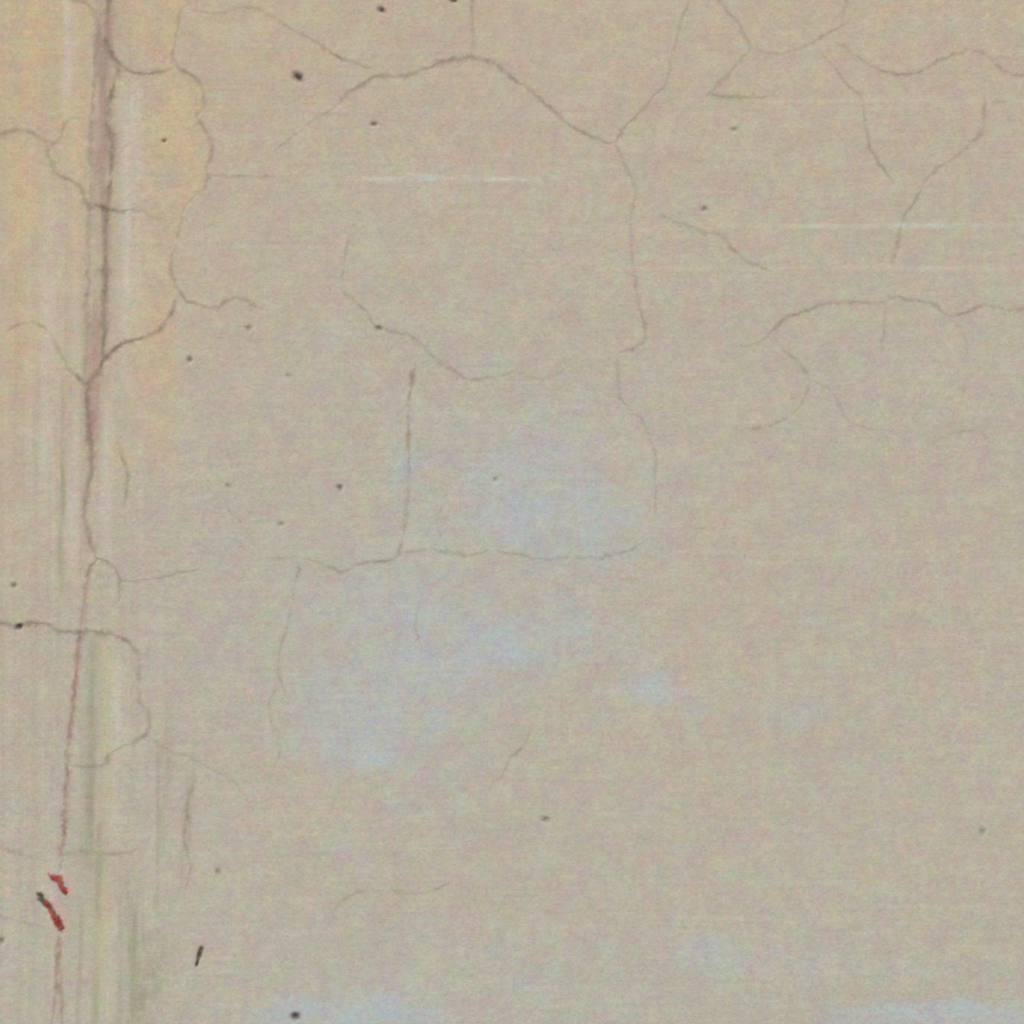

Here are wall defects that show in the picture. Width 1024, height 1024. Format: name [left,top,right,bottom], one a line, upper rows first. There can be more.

crack [704,0,1024,266]
crack [658,213,774,274]
crack [731,293,1024,435]
crack [0,0,693,892]
crack [48,931,68,1024]